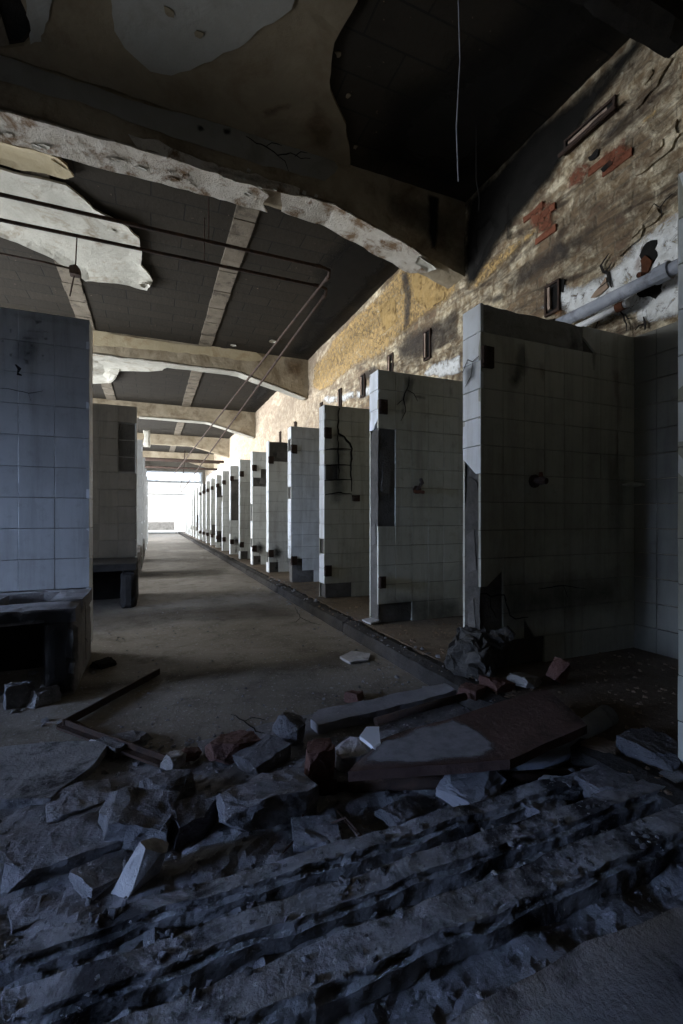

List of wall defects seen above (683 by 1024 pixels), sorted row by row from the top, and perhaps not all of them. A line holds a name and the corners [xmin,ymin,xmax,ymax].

flaking render [0,0,455,400]
flaking render [568,138,633,188]
flaking render [475,201,557,287]
spalling [639,240,658,273]
hole [637,284,662,299]
crack [324,408,353,495]
peeling [371,429,395,619]